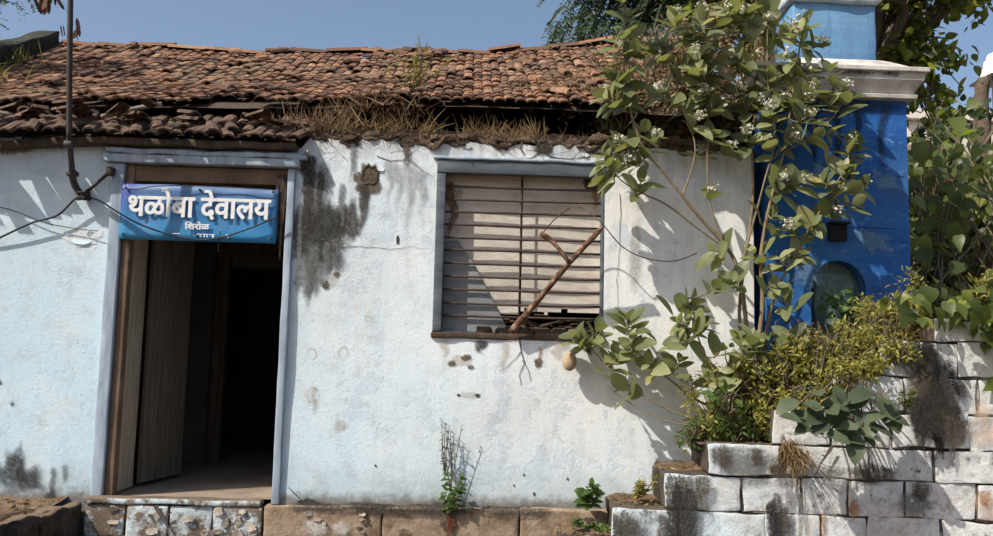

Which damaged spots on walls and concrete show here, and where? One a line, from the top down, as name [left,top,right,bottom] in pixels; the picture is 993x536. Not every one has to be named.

spalling [339,131,385,231]
leakage [283,156,360,297]
leakage [891,341,970,471]
leakage [0,448,67,498]
leakage [711,445,775,474]
leakage [612,474,711,536]
leakage [766,488,803,536]